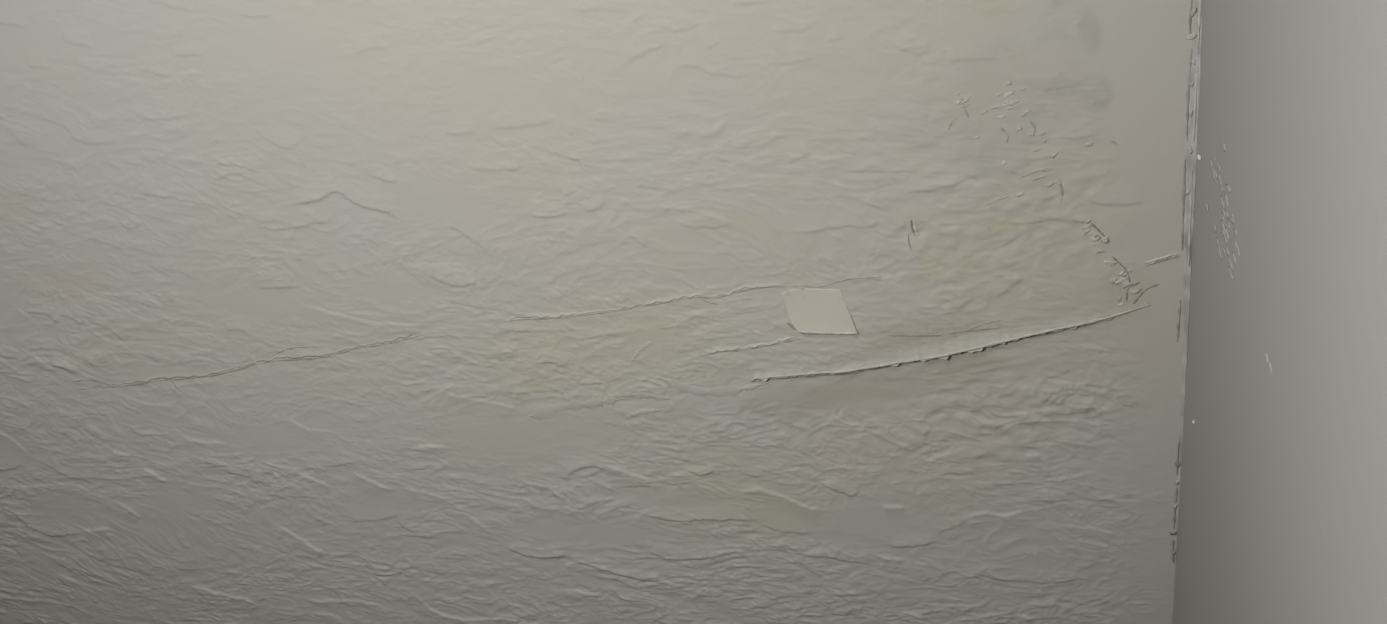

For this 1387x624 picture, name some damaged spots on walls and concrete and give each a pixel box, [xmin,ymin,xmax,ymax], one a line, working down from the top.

peeling [780,289,858,335]
crack [70,332,435,397]
crack [700,340,795,356]